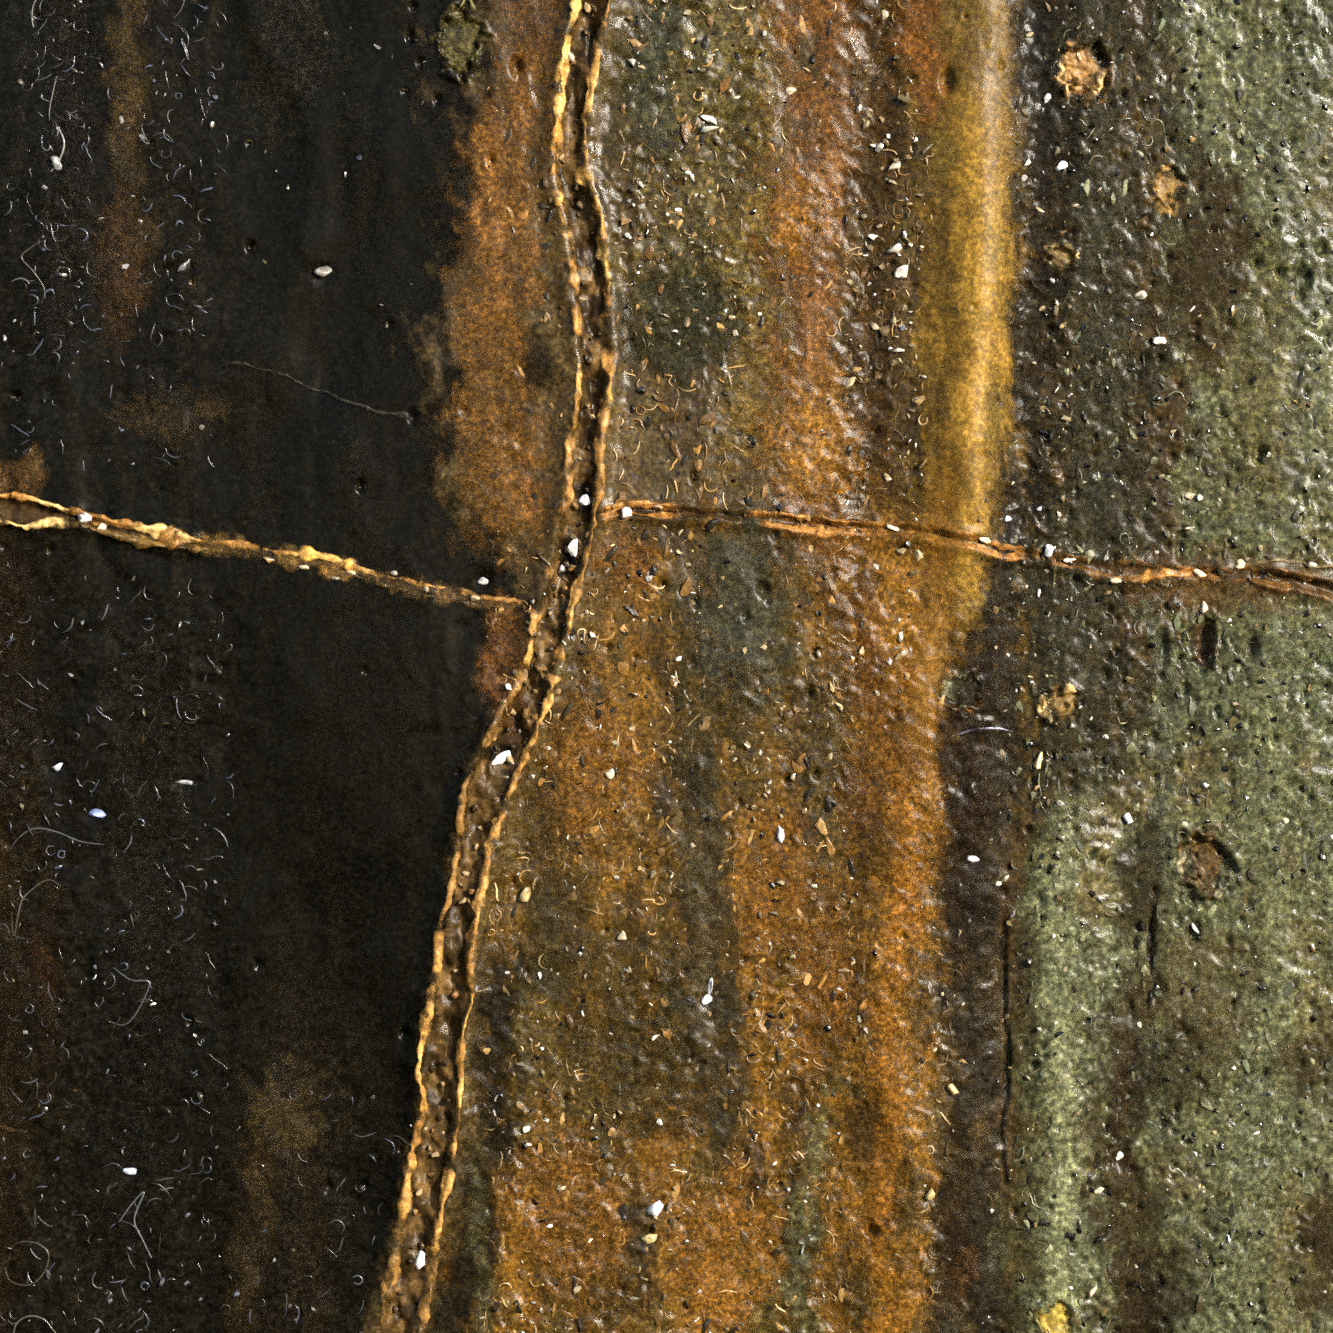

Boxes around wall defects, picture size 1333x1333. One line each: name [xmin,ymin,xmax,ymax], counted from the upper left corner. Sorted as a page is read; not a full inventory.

crack [0,492,520,608]
crack [234,362,406,417]
corrosion [453,0,962,1333]
crack [380,0,1333,1333]
water stain [931,0,1333,1333]